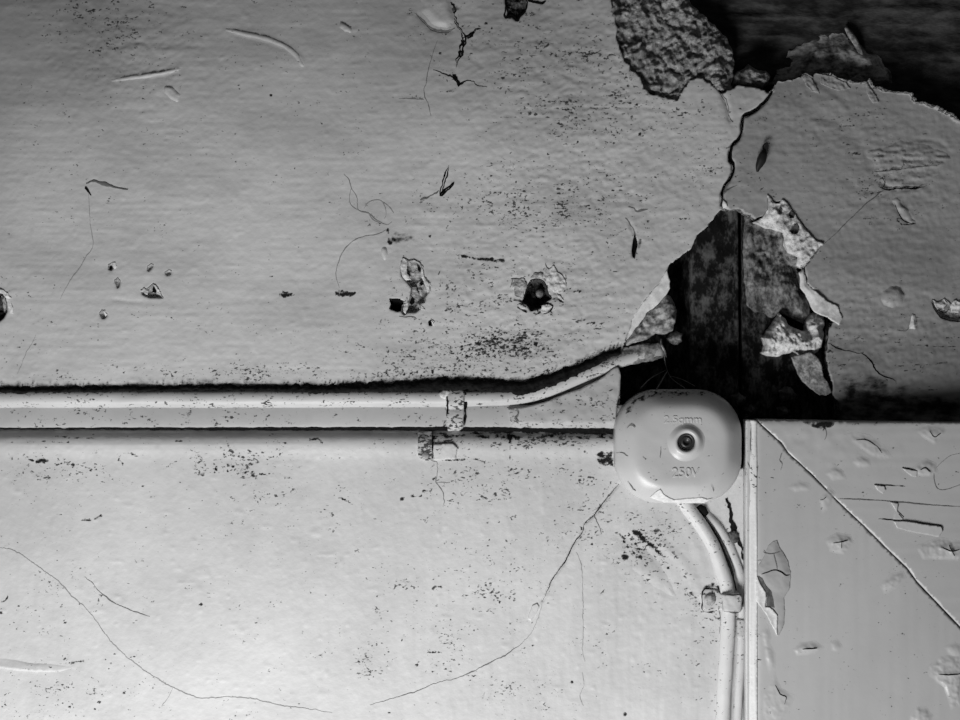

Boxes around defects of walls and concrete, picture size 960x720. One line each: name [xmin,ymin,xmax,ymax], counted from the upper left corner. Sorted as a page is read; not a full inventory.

crack [403,2,486,115]
spalling [611,0,734,101]
crack [720,90,773,208]
spalling [140,284,164,299]
spalling [399,258,431,319]
spalling [623,271,677,347]
spalling [753,195,843,325]
peeling [791,352,831,396]
crack [850,454,959,507]
crack [5,548,331,713]
crack [371,490,614,705]
peeling [756,540,791,636]